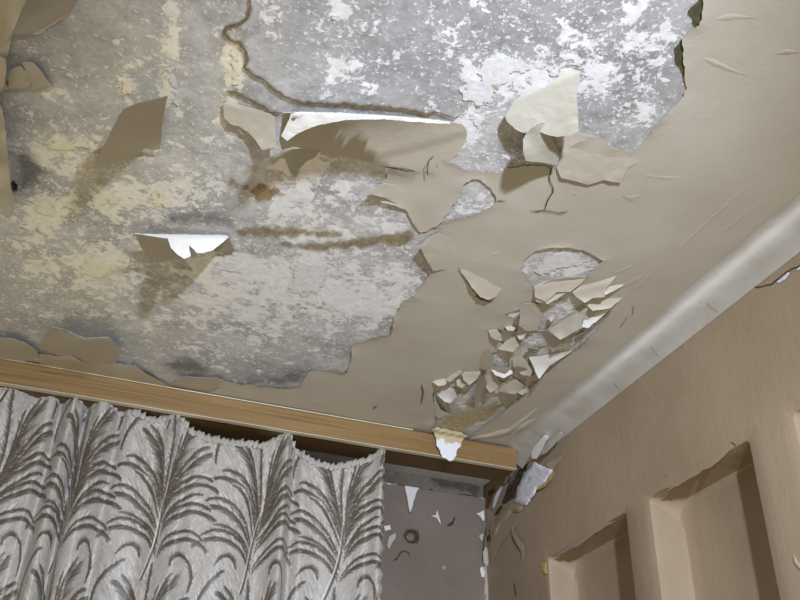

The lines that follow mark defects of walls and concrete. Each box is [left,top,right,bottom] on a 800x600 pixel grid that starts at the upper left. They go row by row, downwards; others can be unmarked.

crack [223,0,466,118]
damp [11,155,42,191]
peeling [0,0,698,389]
crack [533,167,567,214]
damp [238,227,413,250]
peeling [431,247,623,440]
flaking render [476,456,561,541]